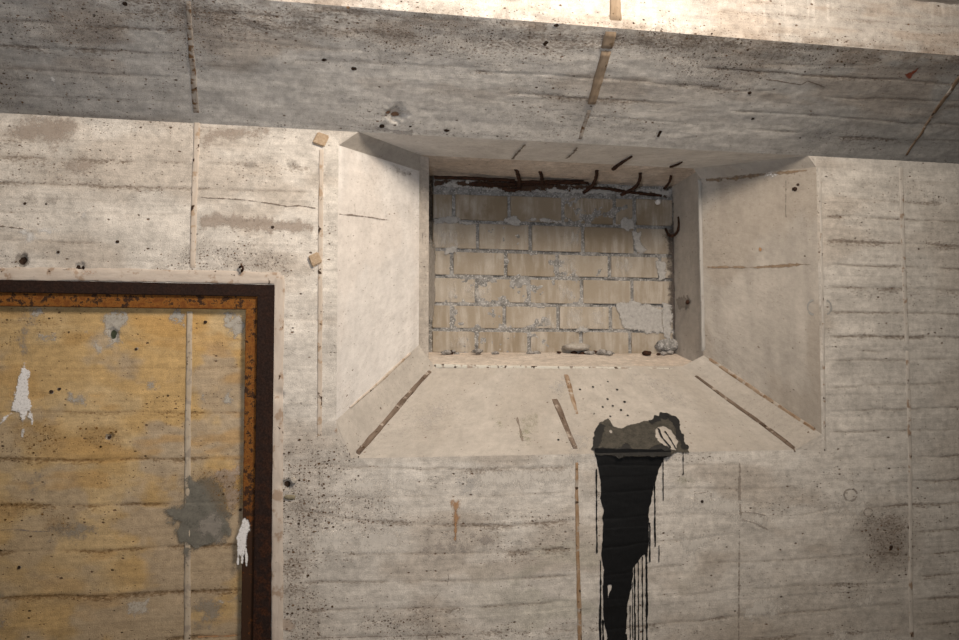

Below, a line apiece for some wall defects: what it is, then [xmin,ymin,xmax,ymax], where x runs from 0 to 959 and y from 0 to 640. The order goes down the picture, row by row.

crack [203,197,315,209]
corrosion [451,499,459,541]